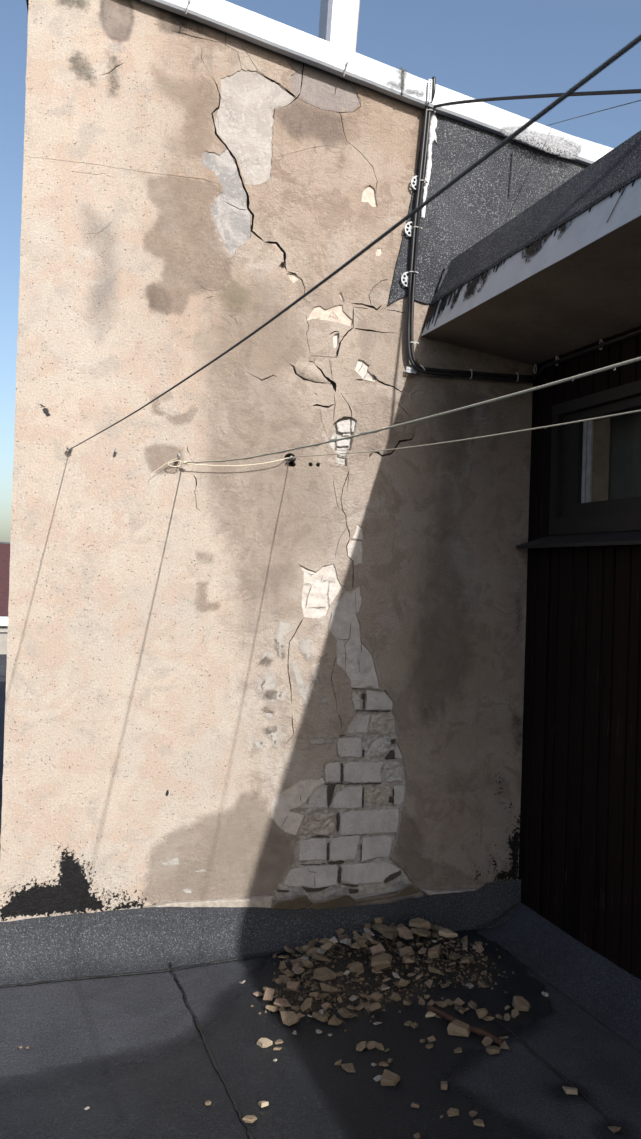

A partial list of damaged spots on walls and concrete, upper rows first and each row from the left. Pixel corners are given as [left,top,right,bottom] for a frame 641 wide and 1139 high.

damp [110,0,134,59]
damp [148,179,227,313]
peeling [201,70,295,255]
crack [177,32,360,294]
spalling [361,185,378,207]
spalling [306,292,352,350]
crack [252,280,418,419]
spalling [329,416,357,466]
crack [333,423,423,574]
crack [286,619,303,743]
spalling [271,564,413,910]
damp [146,797,289,902]